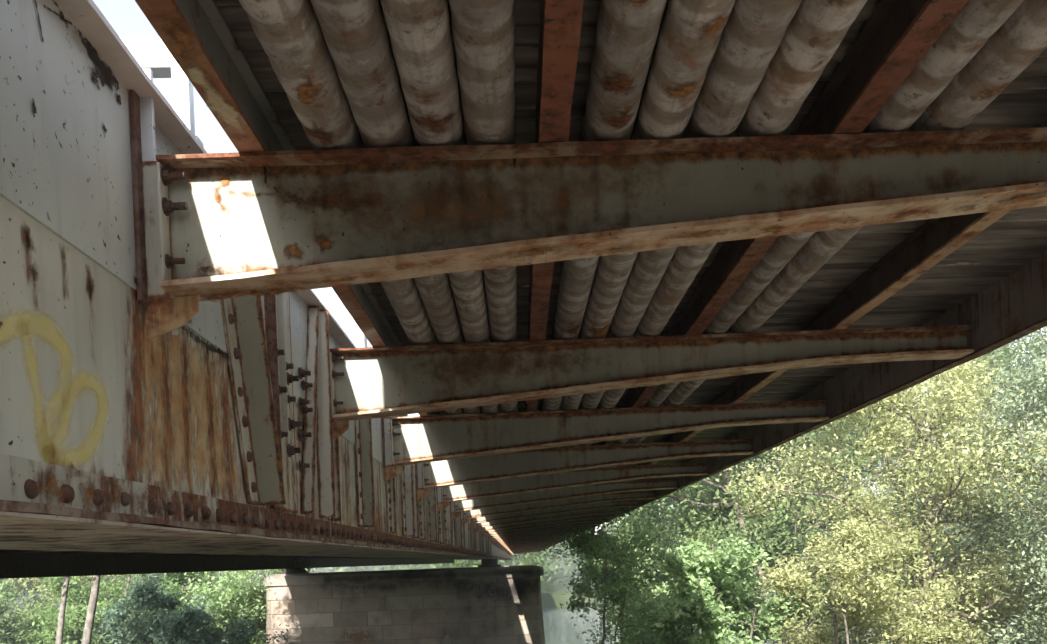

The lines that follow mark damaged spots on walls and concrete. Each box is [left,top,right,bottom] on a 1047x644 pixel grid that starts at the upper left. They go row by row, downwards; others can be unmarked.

rust [296,76,323,104]
rust [412,94,452,134]
rust [214,177,278,210]
rust [21,227,38,303]
rust [284,244,302,257]
rust [86,270,94,301]
rust [124,288,238,502]